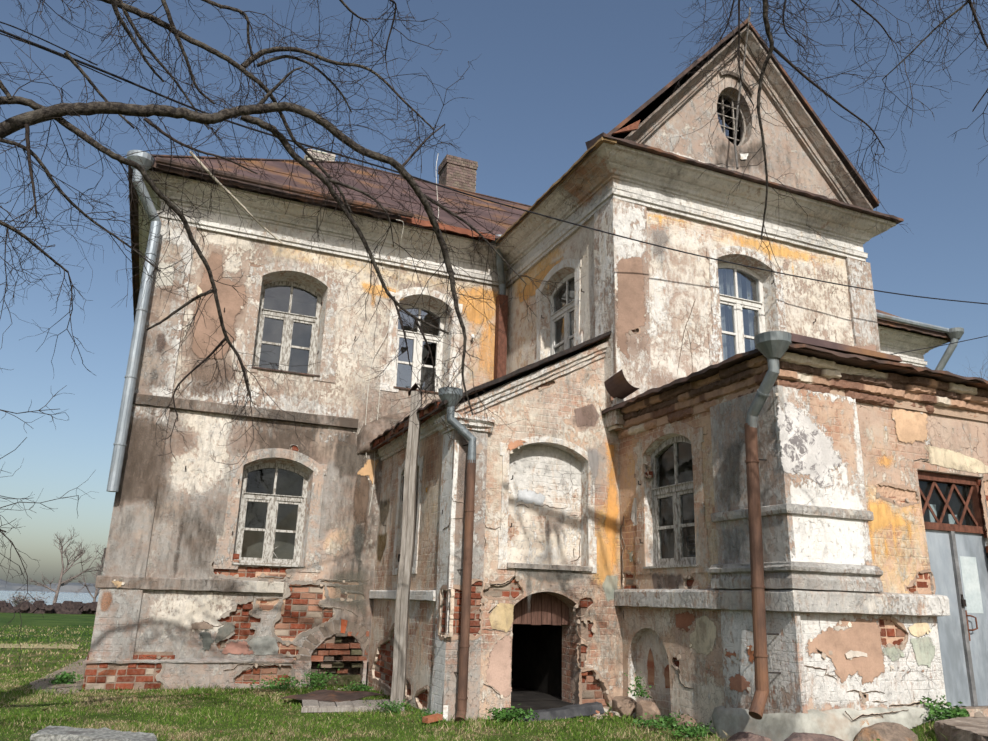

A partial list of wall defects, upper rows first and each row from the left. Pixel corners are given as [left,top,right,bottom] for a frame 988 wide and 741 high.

peeling [191,251,246,359]
leakage [120,417,164,505]
peeling [775,393,842,488]
peeling [892,408,988,553]
flaking render [75,652,175,691]
flaking render [191,554,366,689]
flaking render [371,623,395,693]
flaking render [405,678,431,711]
flaking render [438,575,524,642]
flaking render [573,597,612,710]
peeling [805,615,909,704]
flaking render [904,569,936,595]